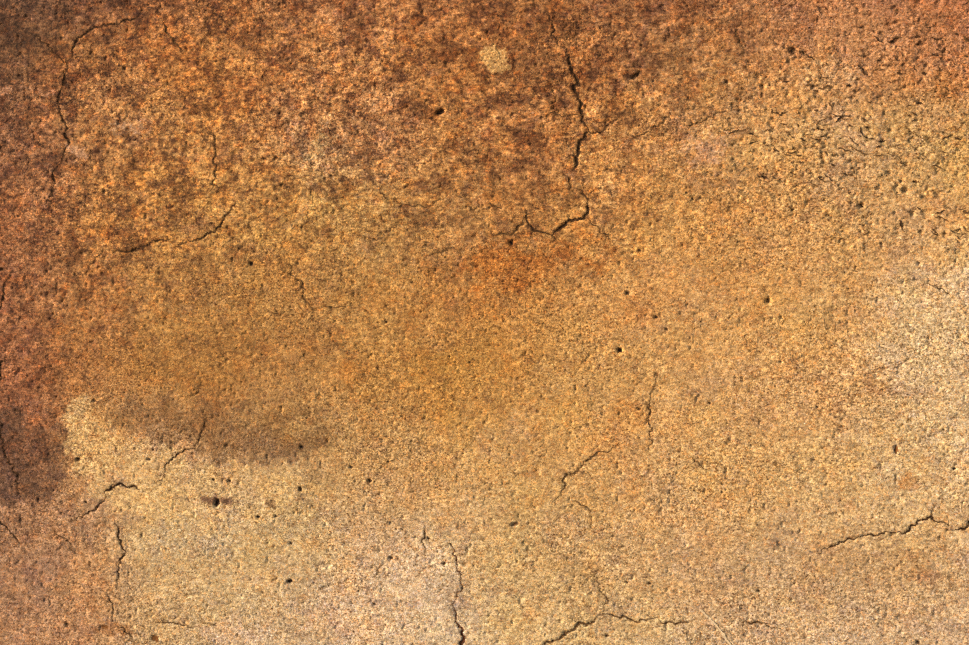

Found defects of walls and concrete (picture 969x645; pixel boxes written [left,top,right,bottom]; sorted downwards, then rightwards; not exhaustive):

crack [37,5,142,211]
crack [494,11,749,241]
crack [370,193,441,240]
leakage [0,394,85,531]
leakage [93,385,354,473]
crack [52,417,216,642]
crack [818,505,969,554]
crack [449,543,465,645]
crack [544,571,689,645]